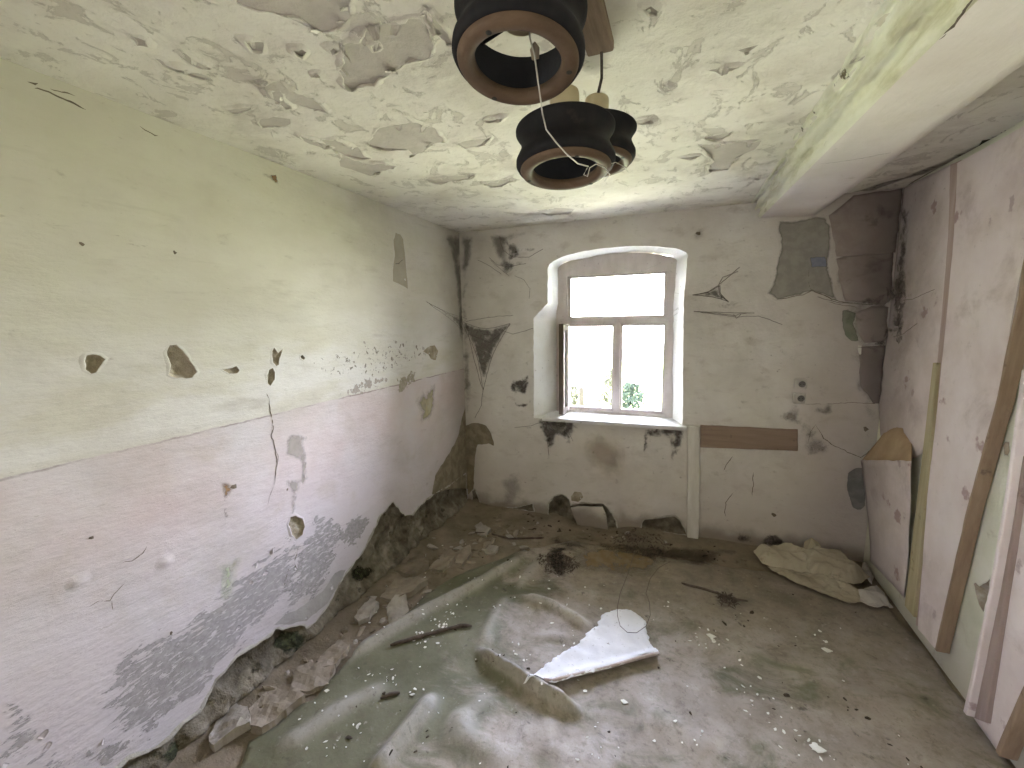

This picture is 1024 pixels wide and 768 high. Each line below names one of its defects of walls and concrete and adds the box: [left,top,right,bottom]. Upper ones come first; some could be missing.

peeling [231,0,453,93]
peeling [221,79,511,176]
peeling [677,131,763,172]
peeling [765,214,862,354]
spalling [78,352,109,375]
spalling [163,343,200,380]
spalling [264,346,284,387]
peeling [321,340,438,397]
crack [267,395,279,502]
leakage [540,421,573,446]
leakage [647,429,682,453]
spalling [86,473,481,768]